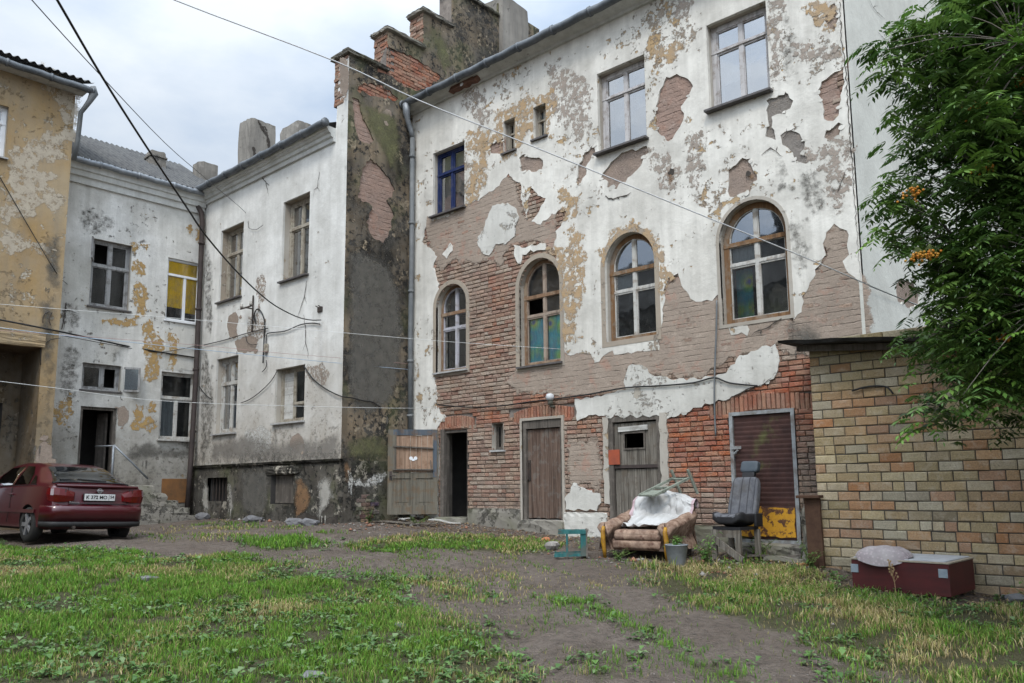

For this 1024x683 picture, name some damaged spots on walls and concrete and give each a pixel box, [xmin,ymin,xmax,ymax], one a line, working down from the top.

peeling [0,62,81,256]
peeling [102,242,183,383]
damp [349,252,402,423]
spalling [358,159,394,243]
damp [367,107,398,168]
spalling [423,0,875,526]
damp [201,353,335,516]
damp [319,480,330,523]
damp [348,470,387,495]